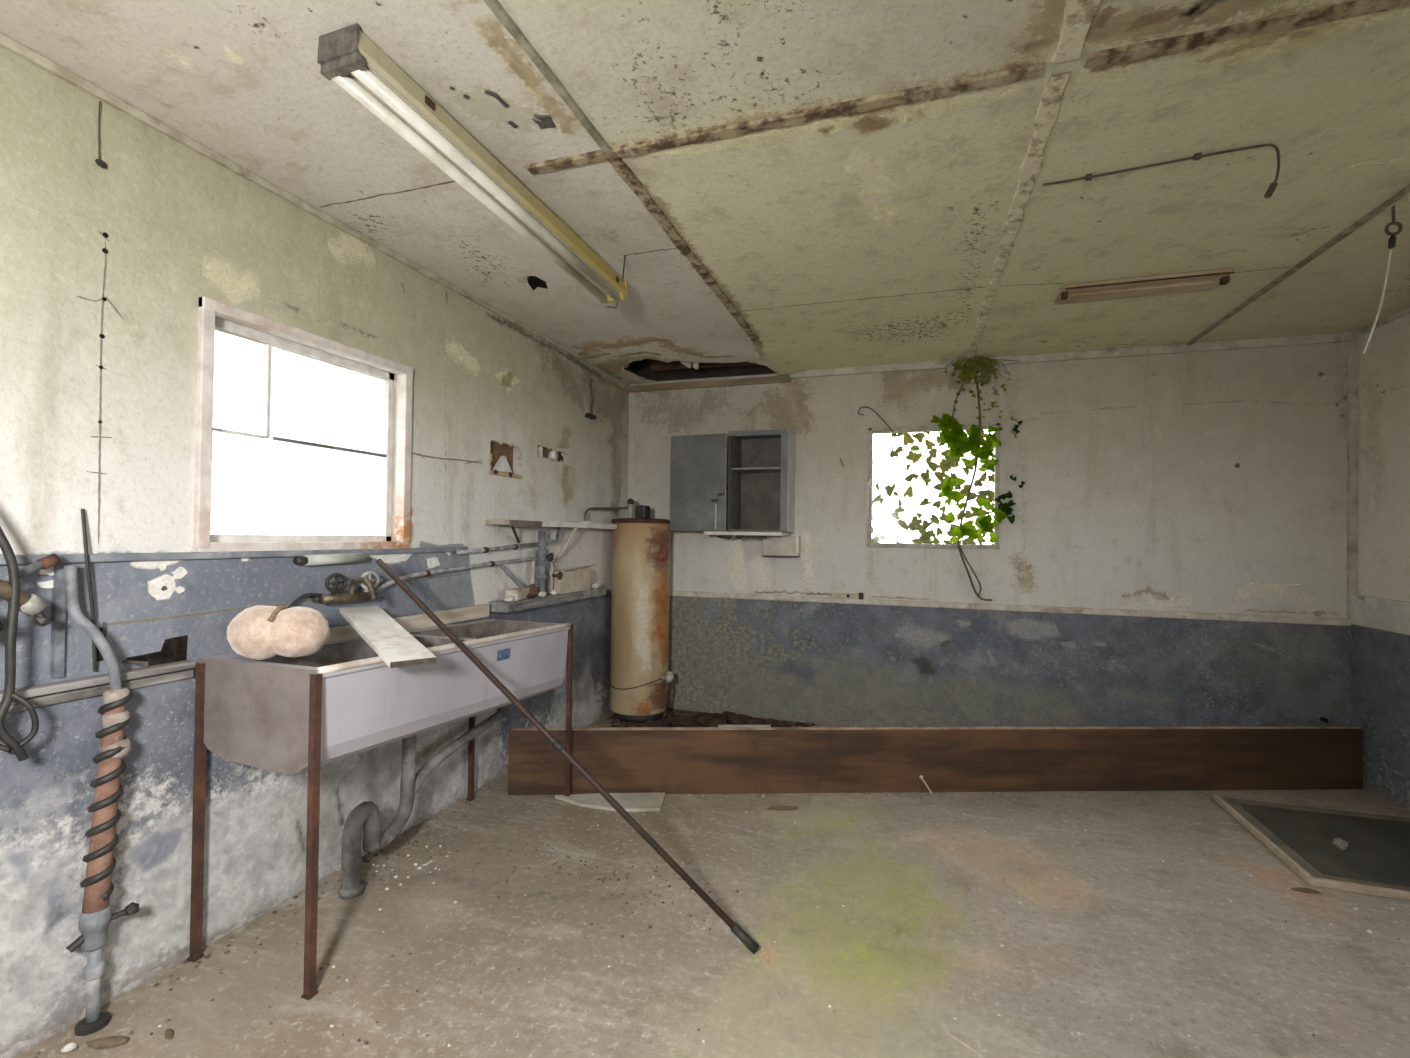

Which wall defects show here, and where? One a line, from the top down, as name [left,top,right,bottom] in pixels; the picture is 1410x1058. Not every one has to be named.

damp [1085,0,1283,43]
peeling [450,87,556,129]
damp [486,313,629,515]